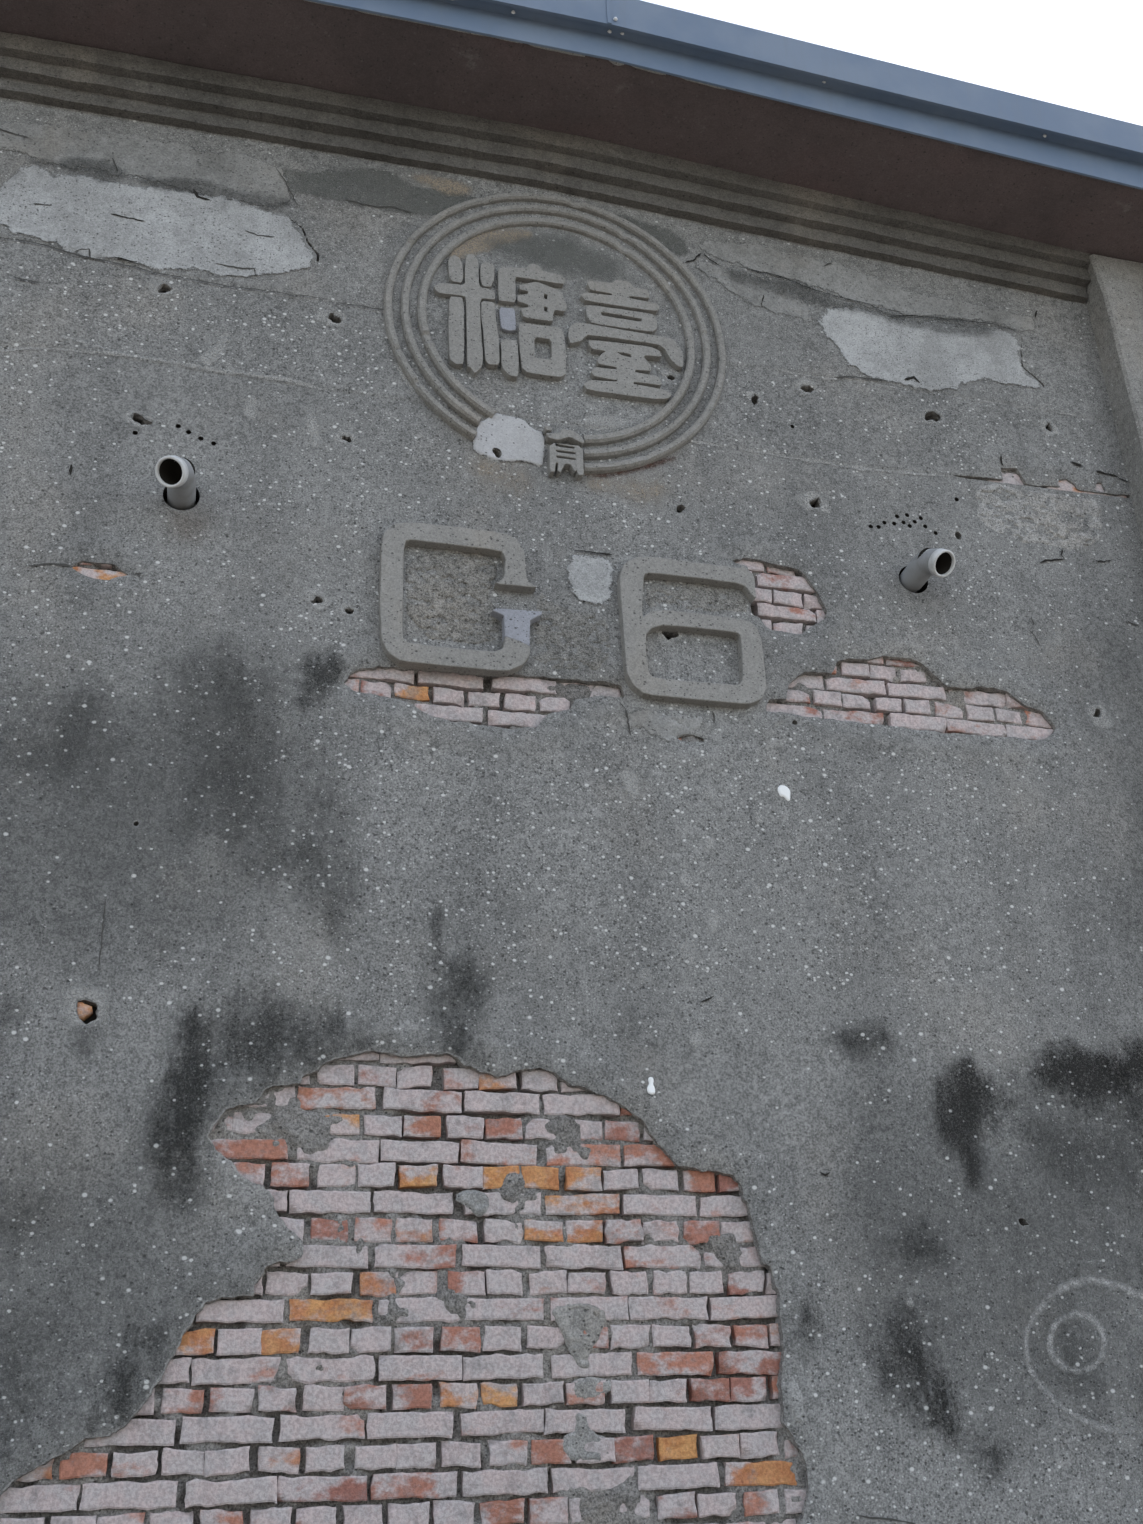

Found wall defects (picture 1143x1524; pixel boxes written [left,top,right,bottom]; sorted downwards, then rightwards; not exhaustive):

flaking render [733,558,827,634]
damp [299,653,343,706]
flaking render [344,666,706,743]
flaking render [766,656,1056,740]
damp [433,957,485,1053]
damp [837,1028,892,1056]
damp [146,996,345,1210]
damp [935,1057,1014,1191]
damp [1030,1039,1143,1184]
flaking render [0,1051,809,1524]
damp [869,1306,959,1442]
damp [1025,1277,1143,1398]